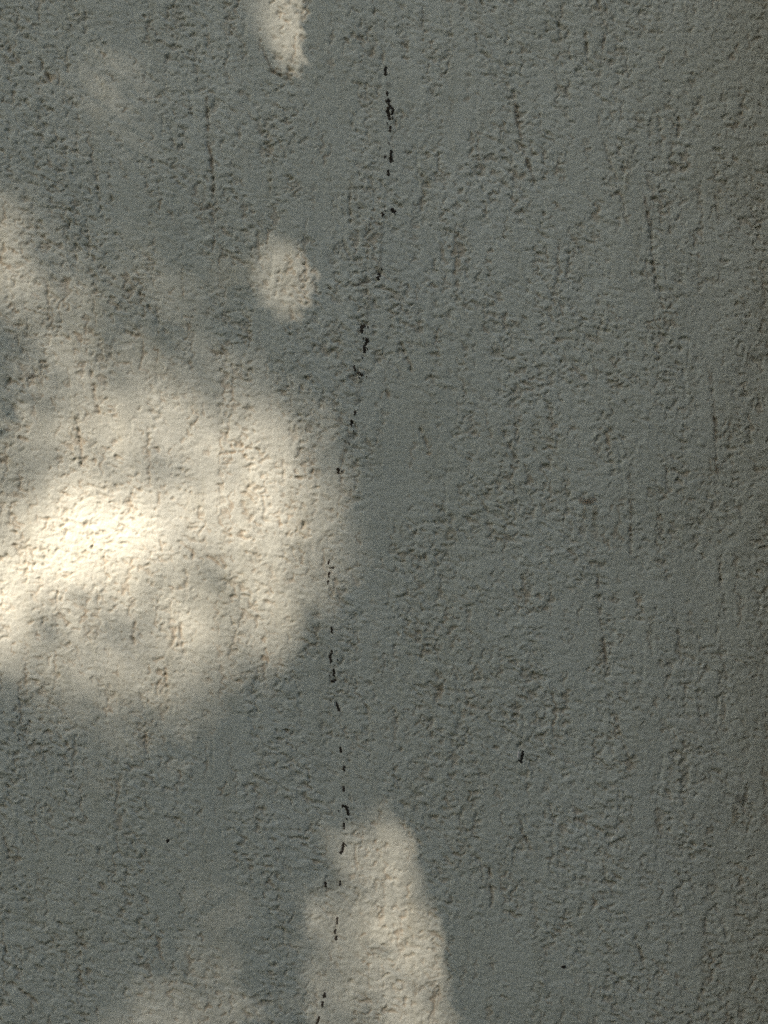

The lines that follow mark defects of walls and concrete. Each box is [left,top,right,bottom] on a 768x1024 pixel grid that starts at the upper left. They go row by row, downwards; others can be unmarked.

crack [383,66,394,176]
crack [352,324,369,379]
crack [328,627,340,712]
crack [338,746,350,854]